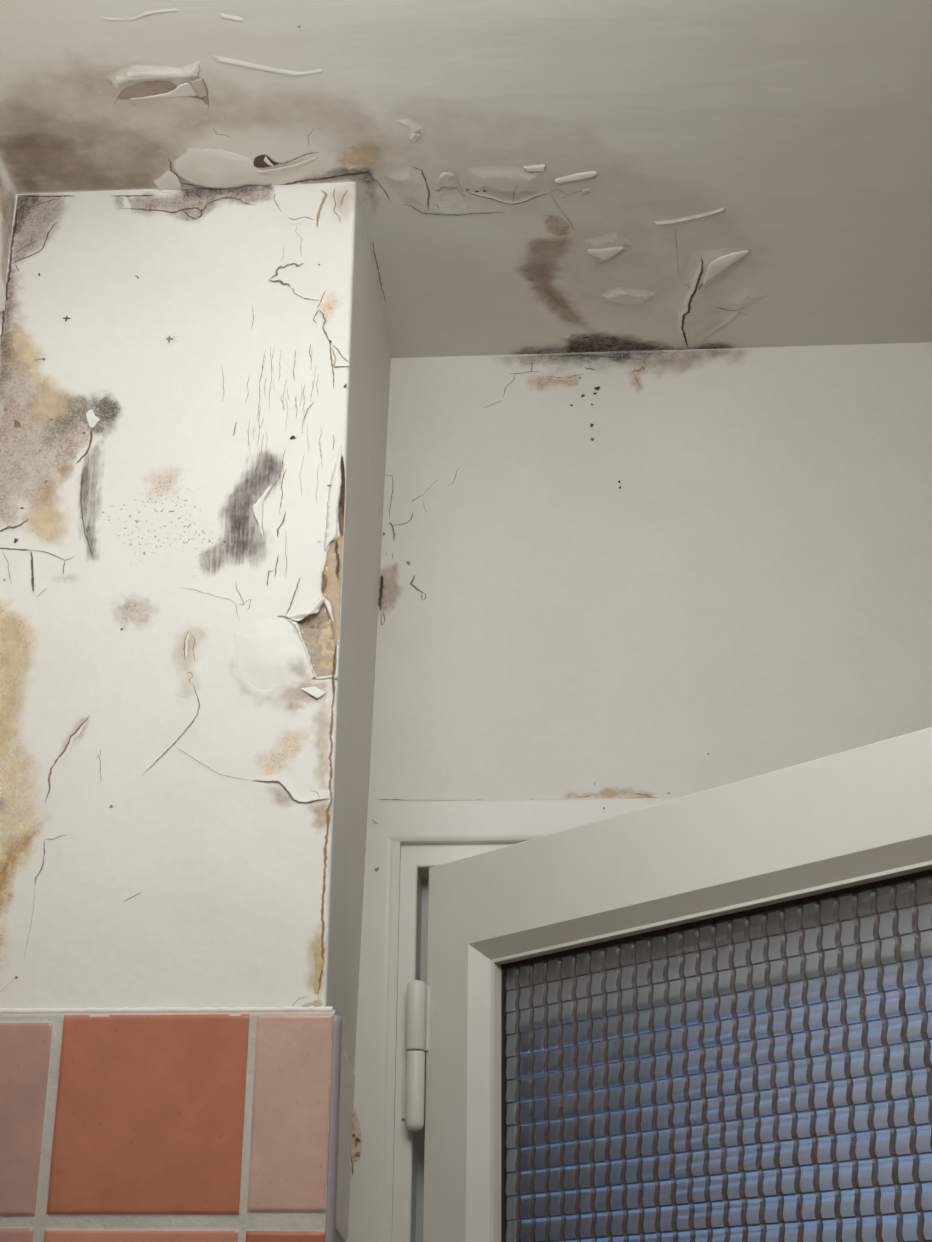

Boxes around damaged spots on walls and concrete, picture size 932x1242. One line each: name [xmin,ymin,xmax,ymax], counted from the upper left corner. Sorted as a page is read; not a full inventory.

peeling [104,61,209,106]
peeling [154,148,318,193]
peeling [523,164,597,198]
crack [0,211,17,337]
crack [222,166,582,491]
leakage [520,289,652,360]
crack [669,230,769,349]
leakage [0,334,117,554]
crack [0,507,74,596]
leakage [209,501,249,570]
flaking render [277,445,345,695]
crack [145,687,335,1007]